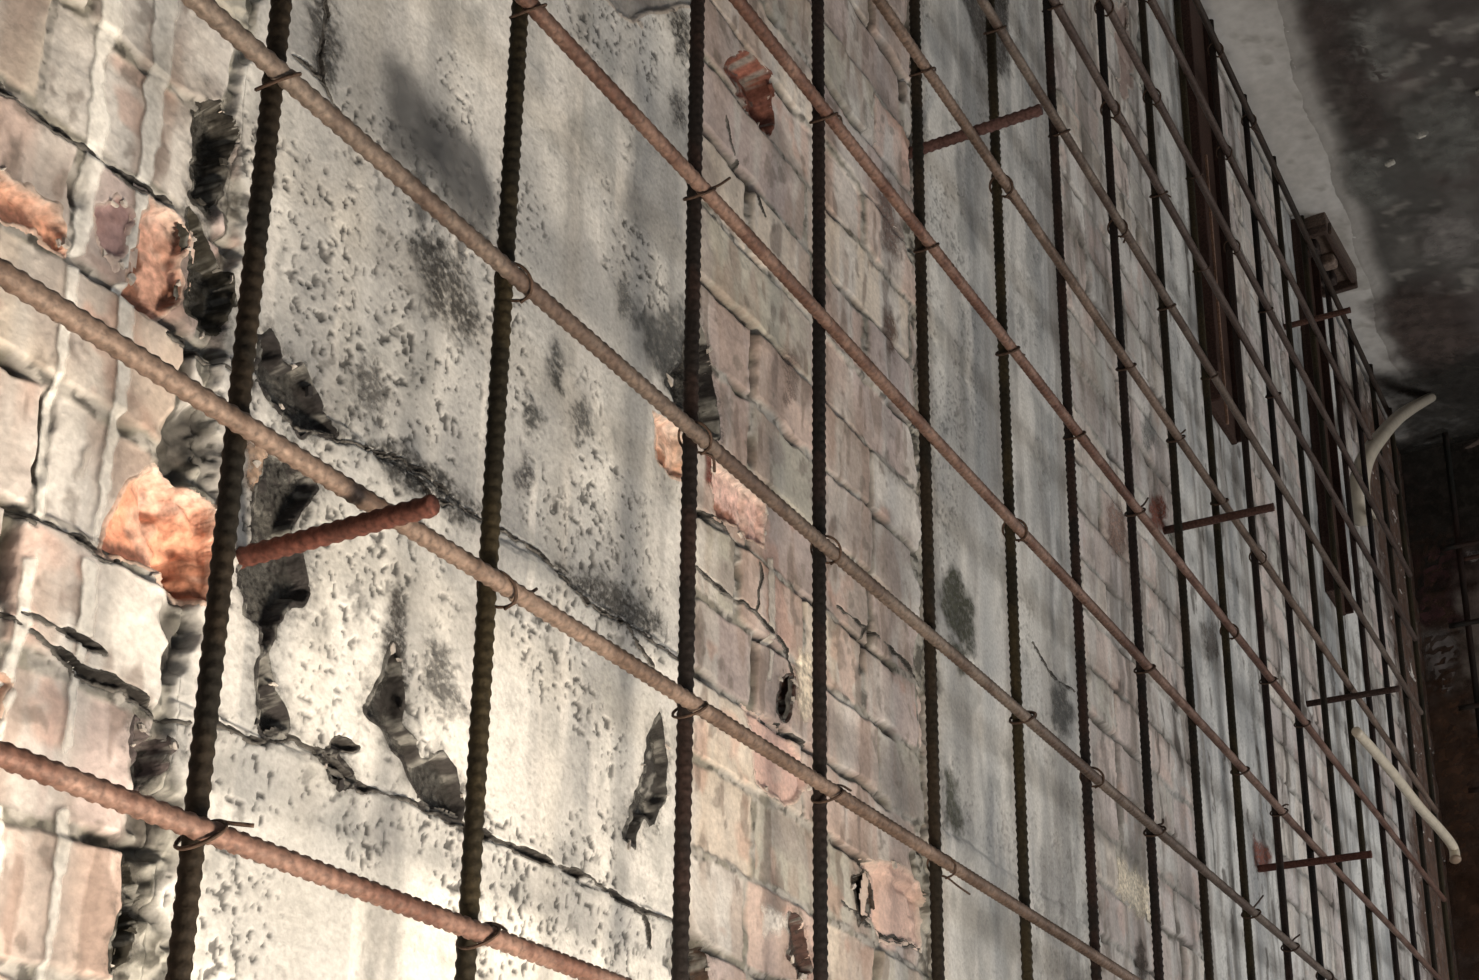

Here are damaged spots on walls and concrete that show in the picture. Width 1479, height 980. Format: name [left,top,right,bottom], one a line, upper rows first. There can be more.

damp [1306,0,1396,205]
damp [1379,290,1479,368]
damp [1406,93,1479,177]
damp [1418,207,1479,259]
crack [293,424,679,671]
spalling [0,0,1167,980]
spalling [1108,0,1479,980]
crack [0,611,672,950]